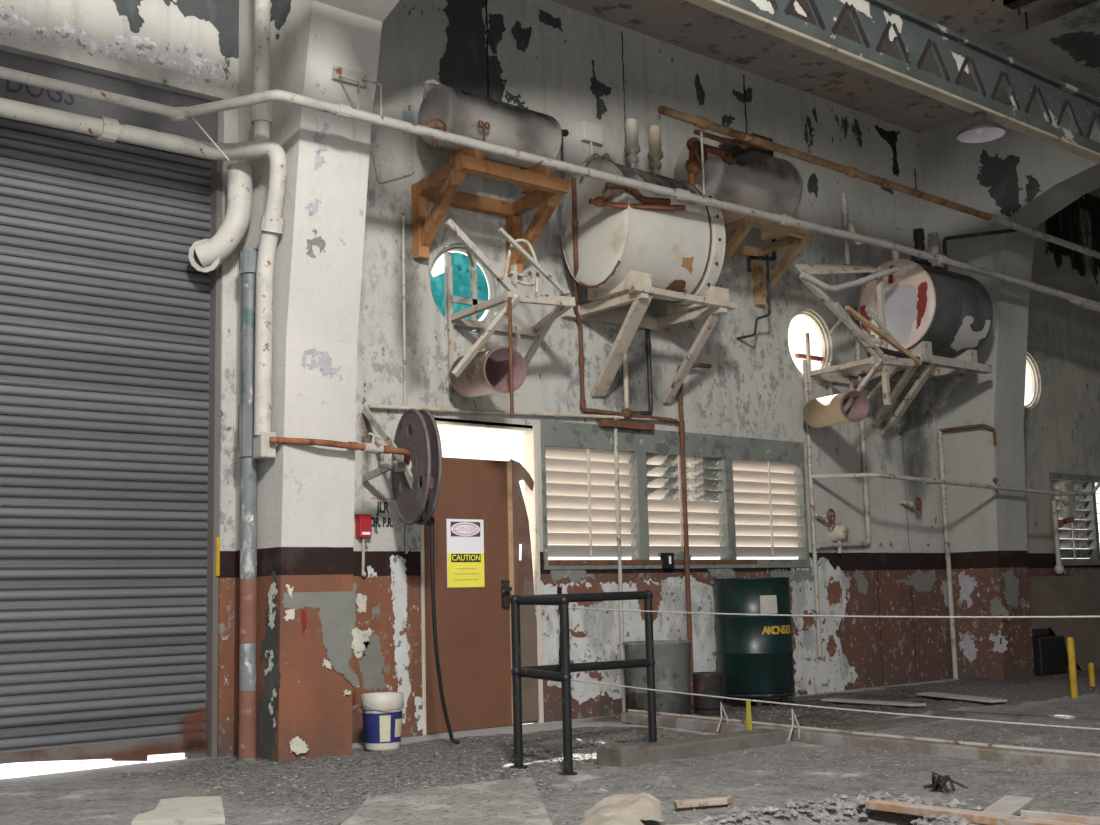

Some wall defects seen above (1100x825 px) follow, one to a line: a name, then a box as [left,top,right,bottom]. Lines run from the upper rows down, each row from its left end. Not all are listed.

peeling [113,0,145,33]
peeling [164,0,239,59]
peeling [270,0,291,40]
peeling [438,0,563,109]
peeling [589,60,611,120]
peeling [977,149,1041,217]
peeling [1044,193,1100,285]
peeling [257,555,423,761]
flaking render [535,558,735,704]
flaking render [767,557,869,695]
corrosion [70,710,206,765]